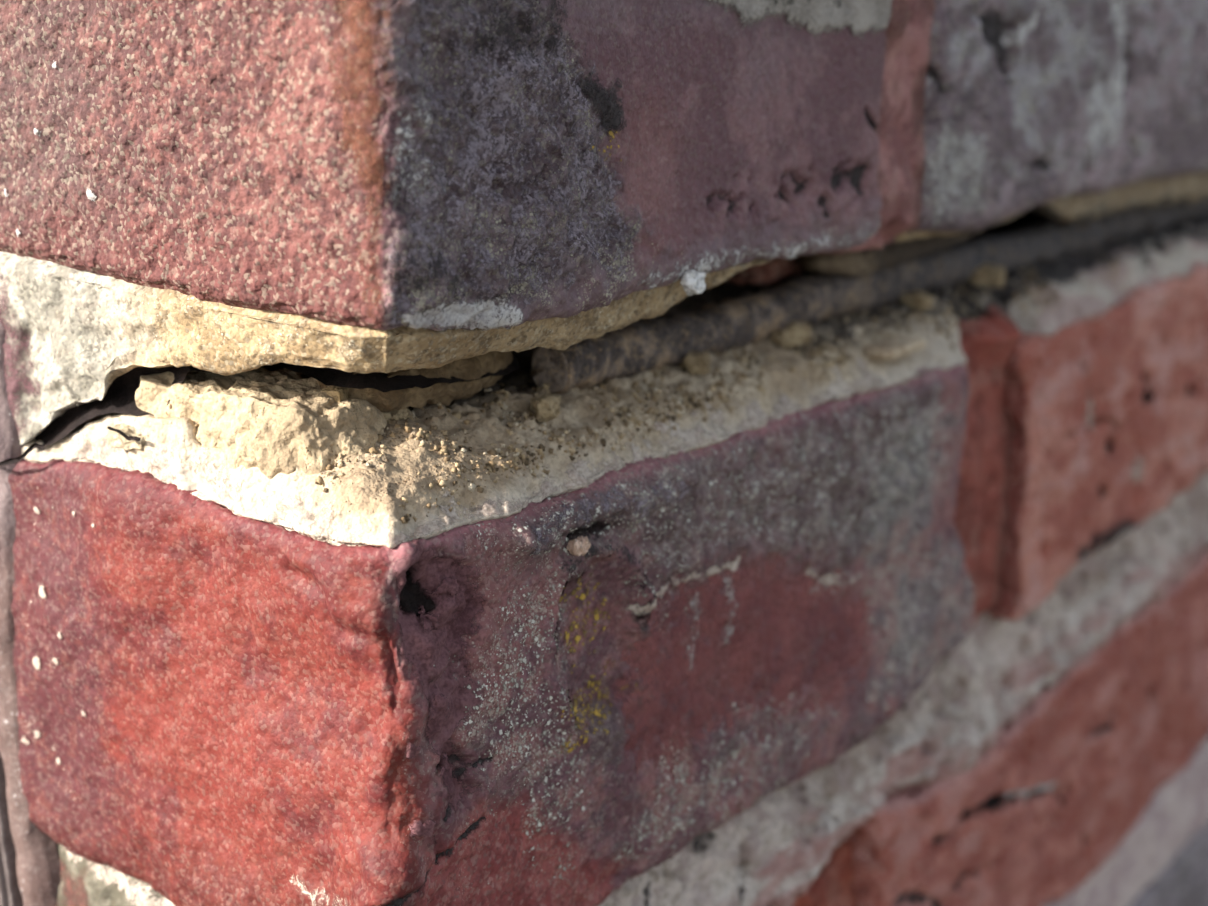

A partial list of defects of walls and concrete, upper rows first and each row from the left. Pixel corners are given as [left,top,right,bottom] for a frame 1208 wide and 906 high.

spalling [797,232,974,276]
spalling [969,263,1006,287]
spalling [771,321,812,350]
crack [250,351,519,392]
crack [0,365,212,466]
spalling [106,422,148,451]
spalling [530,394,561,423]
crack [386,754,494,906]
crack [932,785,1064,844]
crack [892,860,999,906]